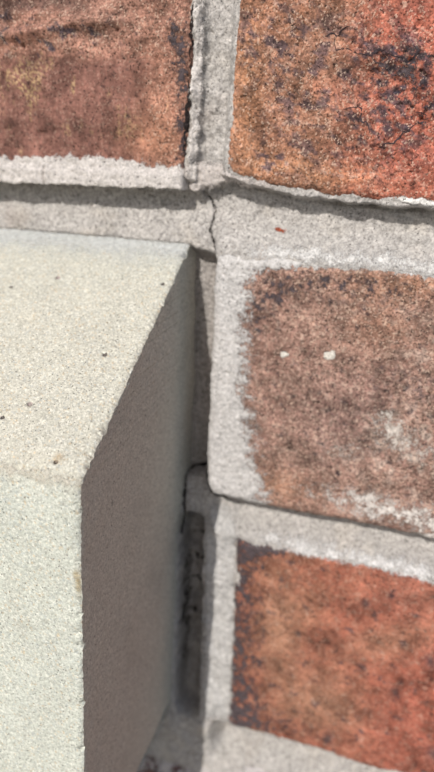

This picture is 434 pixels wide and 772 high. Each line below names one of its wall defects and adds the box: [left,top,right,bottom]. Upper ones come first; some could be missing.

crack [206,192,216,248]
crack [180,462,244,658]